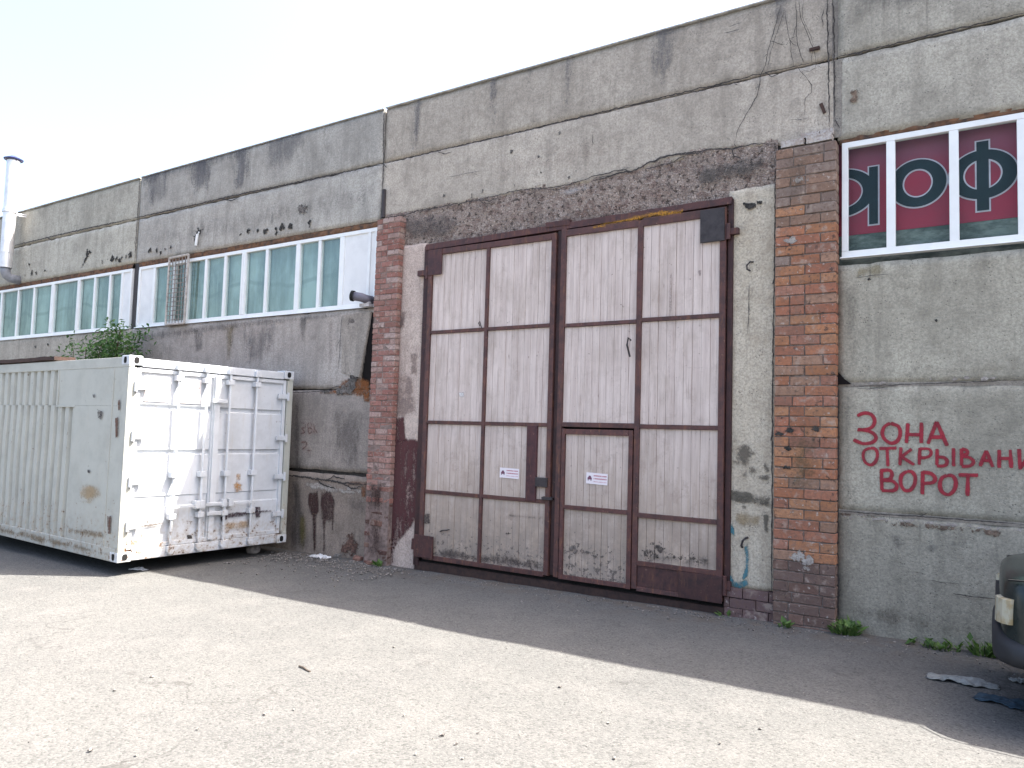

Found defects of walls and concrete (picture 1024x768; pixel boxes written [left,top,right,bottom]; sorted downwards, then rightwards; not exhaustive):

crack [15,0,1024,262]
spalling [385,138,778,246]
crack [289,475,367,489]